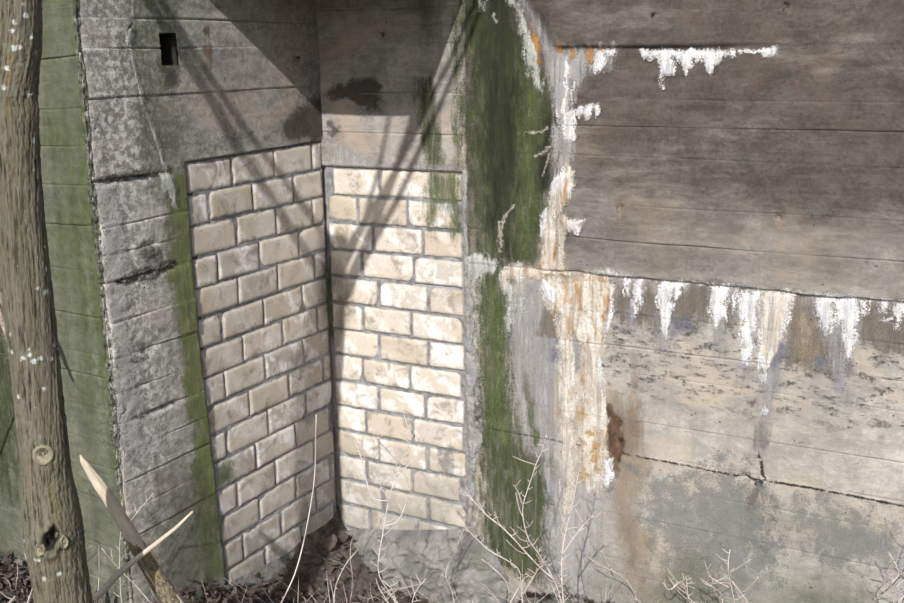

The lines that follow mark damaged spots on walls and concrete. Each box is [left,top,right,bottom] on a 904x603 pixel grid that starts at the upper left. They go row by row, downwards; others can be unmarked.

damp [283,78,382,142]
damp [328,145,459,172]
damp [466,0,904,598]